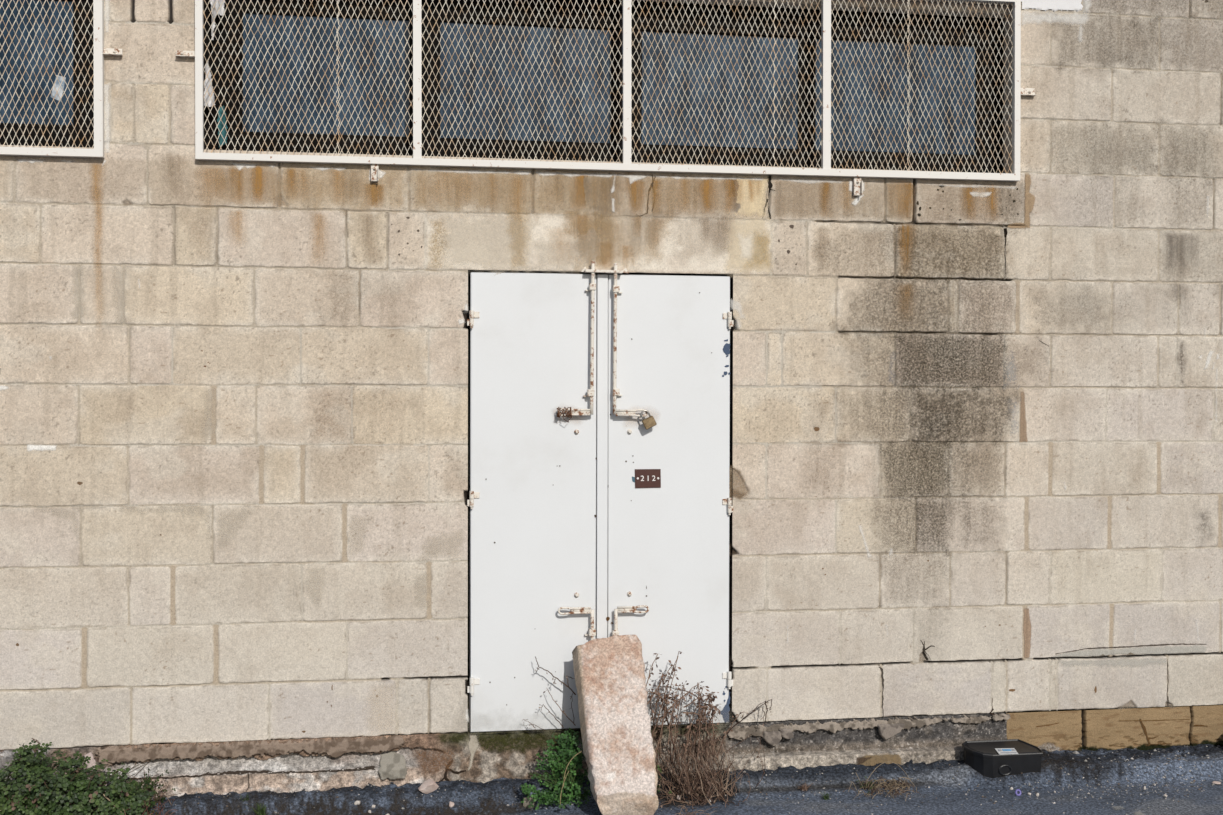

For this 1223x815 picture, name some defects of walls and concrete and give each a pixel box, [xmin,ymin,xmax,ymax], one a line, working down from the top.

water stain [887,338,1016,494]
crack [921,641,935,663]
flaking render [84,731,405,769]
spalling [857,754,901,766]